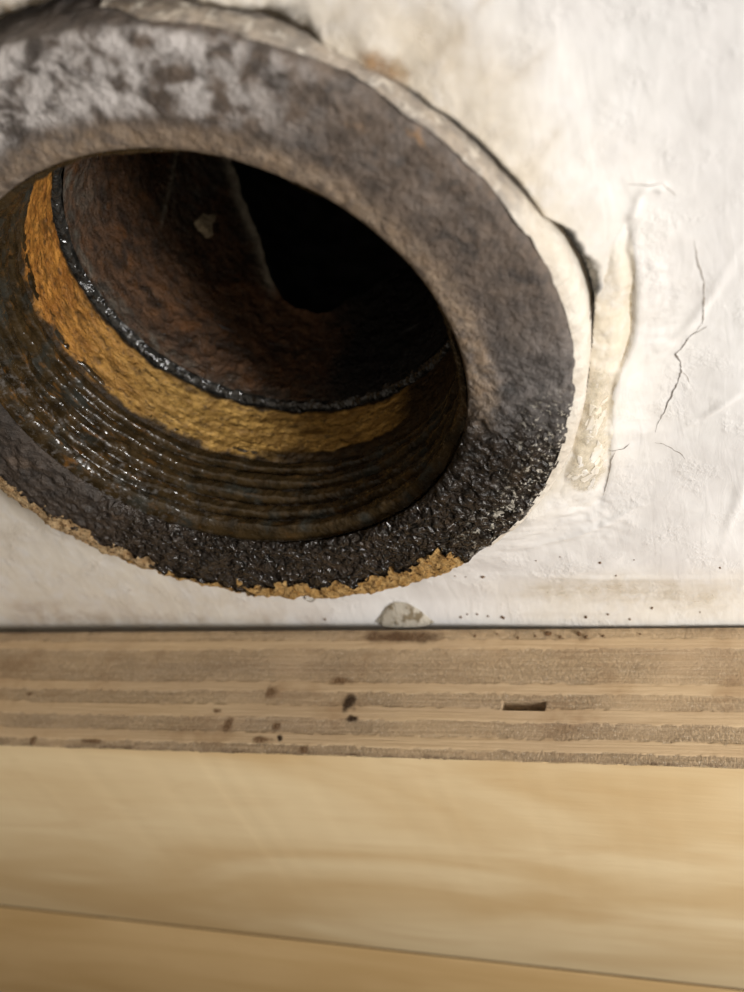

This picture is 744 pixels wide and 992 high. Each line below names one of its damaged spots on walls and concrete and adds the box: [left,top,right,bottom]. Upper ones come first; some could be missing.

crack [655,243,706,459]
corrosion [0,476,472,600]